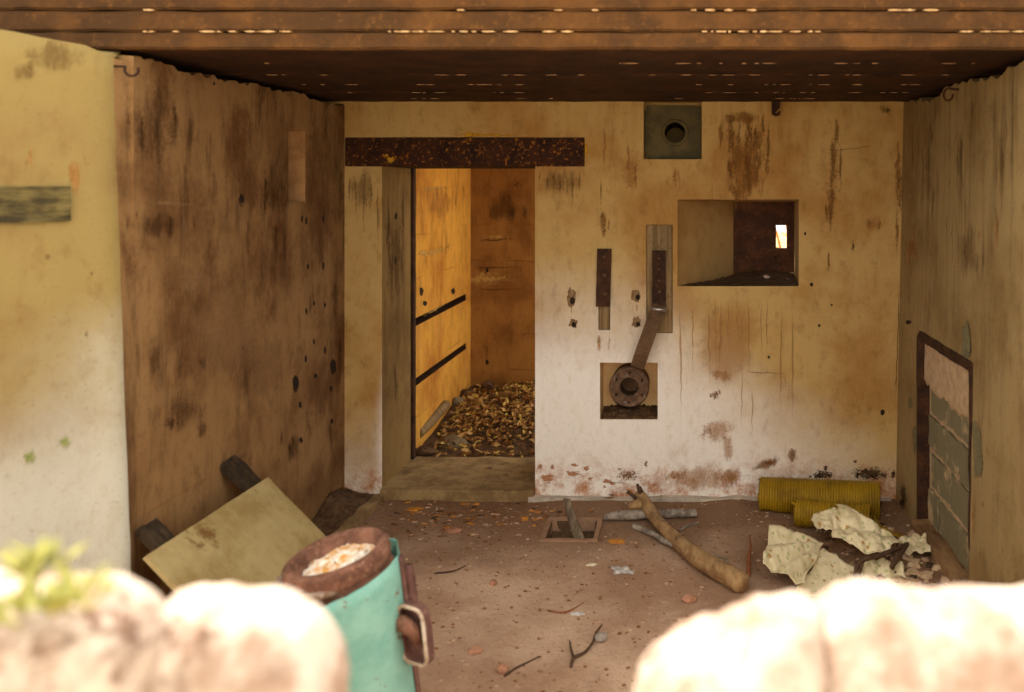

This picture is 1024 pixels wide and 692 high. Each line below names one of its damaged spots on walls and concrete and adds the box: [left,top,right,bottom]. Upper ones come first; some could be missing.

corrosion [719,112,770,208]
corrosion [825,121,842,220]
peeling [567,460,648,496]
mould [809,466,832,478]
mould [852,460,907,509]